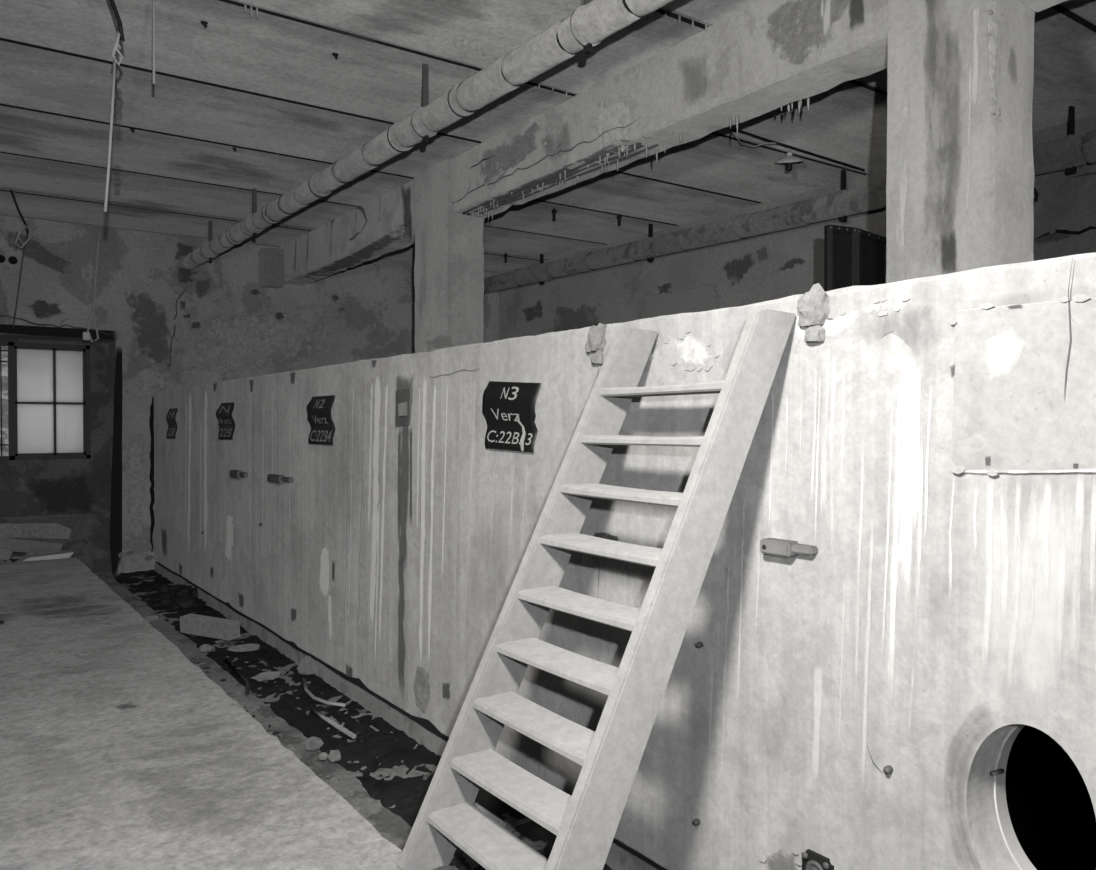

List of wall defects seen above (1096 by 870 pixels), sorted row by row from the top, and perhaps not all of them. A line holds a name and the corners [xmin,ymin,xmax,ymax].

leakage [821,0,831,36]
spalling [463,87,682,223]
leakage [942,235,956,271]
crack [1037,225,1096,396]
leakage [769,350,845,534]
leakage [840,358,932,772]
leakage [973,481,1096,677]
leakage [813,669,822,776]